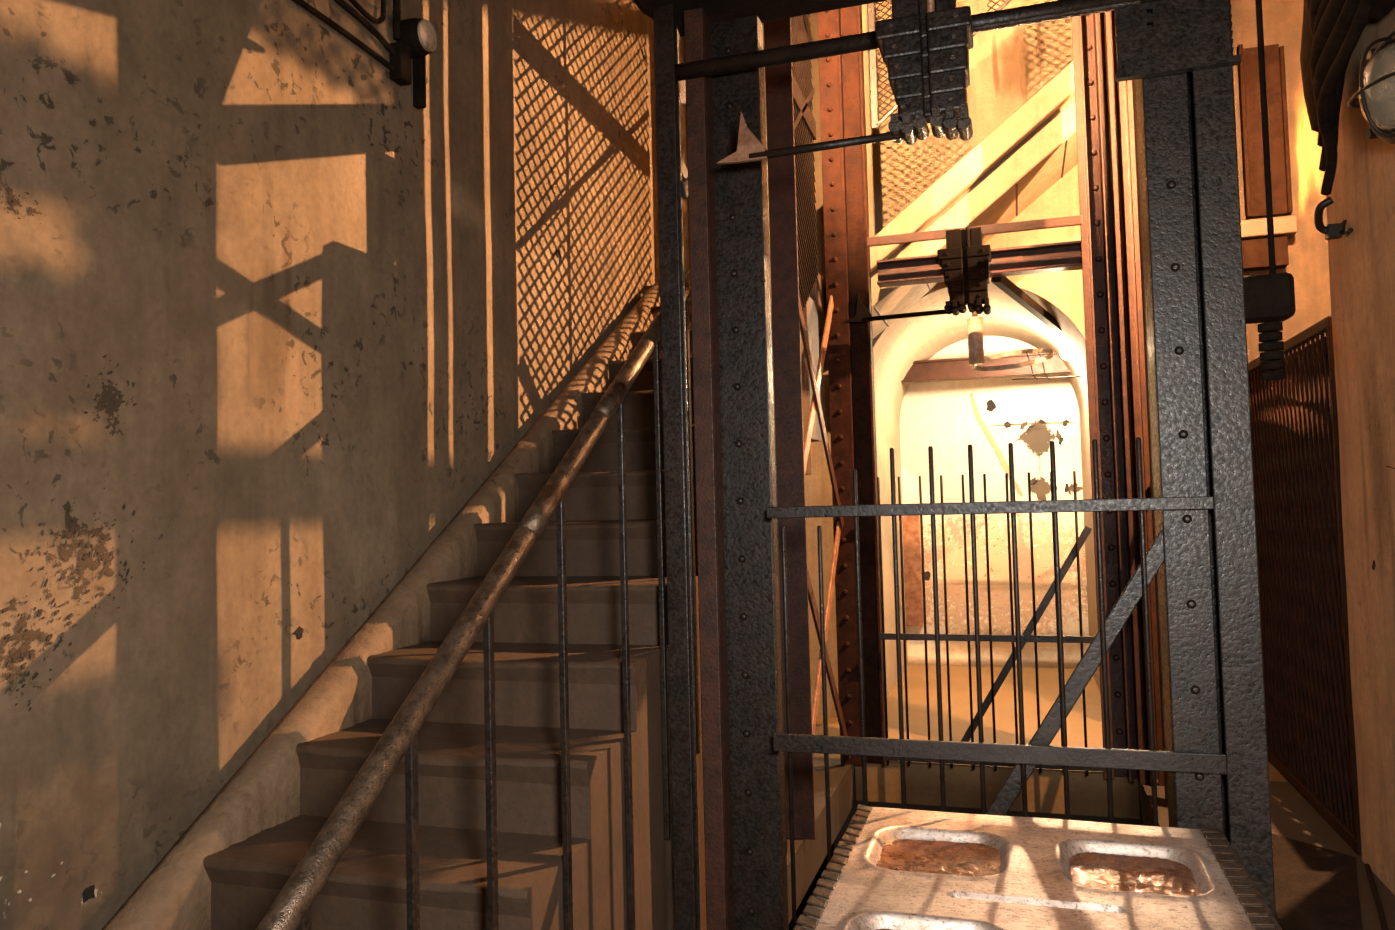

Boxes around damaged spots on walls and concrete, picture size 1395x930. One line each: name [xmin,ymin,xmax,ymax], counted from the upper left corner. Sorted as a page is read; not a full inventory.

spalling [986,399,1069,457]
spalling [1030,476,1083,500]
peeling [0,497,145,711]